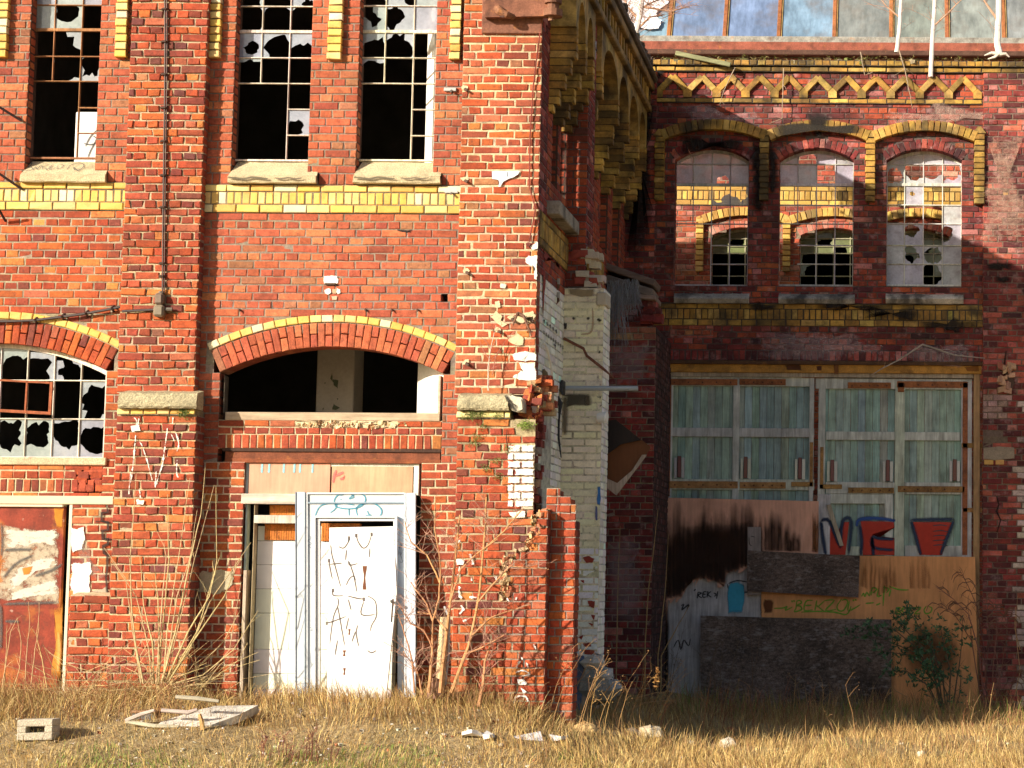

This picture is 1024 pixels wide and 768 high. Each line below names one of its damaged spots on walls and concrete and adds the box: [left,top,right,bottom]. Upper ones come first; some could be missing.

spalling [507,242,562,421]
peeling [508,445,534,518]
corrosion [54,509,63,527]
peeling [70,562,106,594]
corrosion [51,609,62,674]